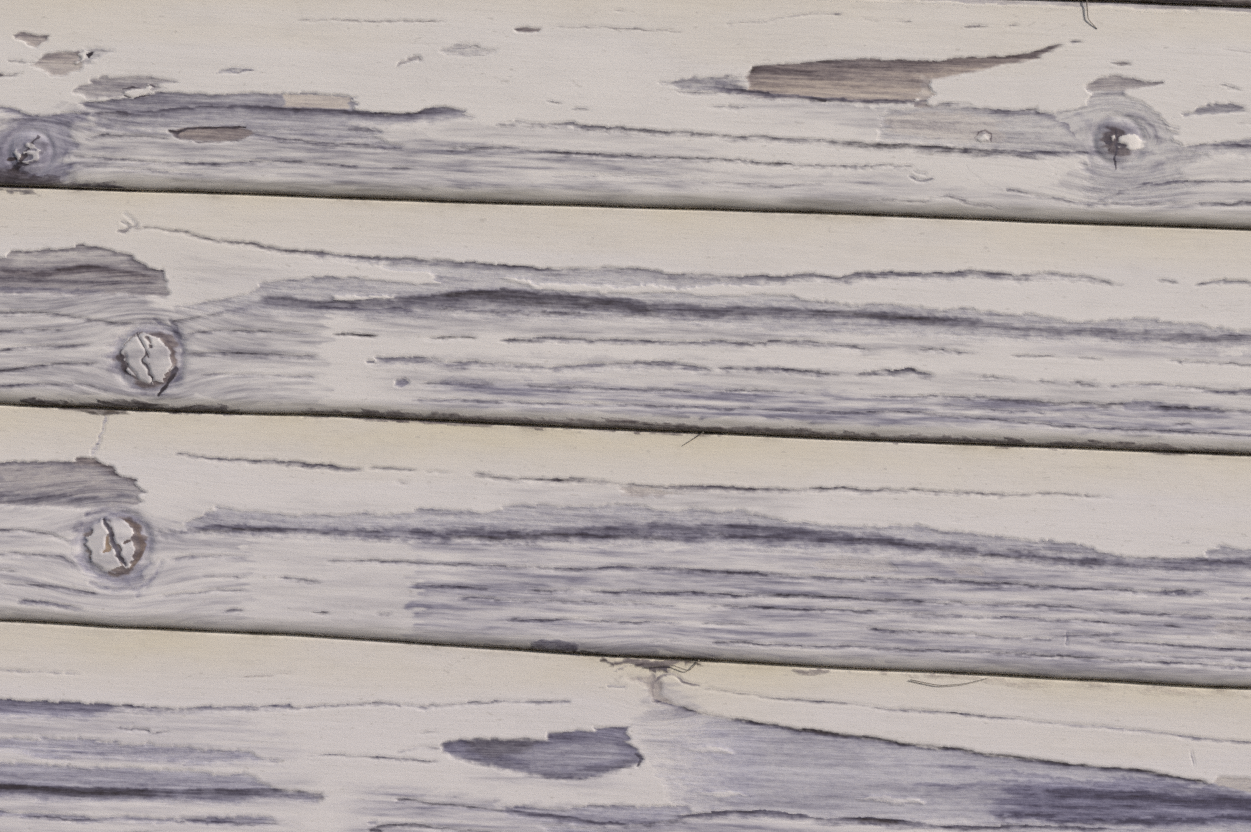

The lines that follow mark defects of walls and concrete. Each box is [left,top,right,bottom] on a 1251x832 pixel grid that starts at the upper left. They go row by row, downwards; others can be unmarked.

peeling [893,0,1251,14]
peeling [0,31,476,183]
peeling [657,39,1251,204]
peeling [0,243,1251,354]
peeling [121,332,173,383]
peeling [365,355,1251,417]
peeling [0,456,148,573]
peeling [152,502,1251,582]
peeling [0,698,571,767]
peeling [306,696,1251,832]